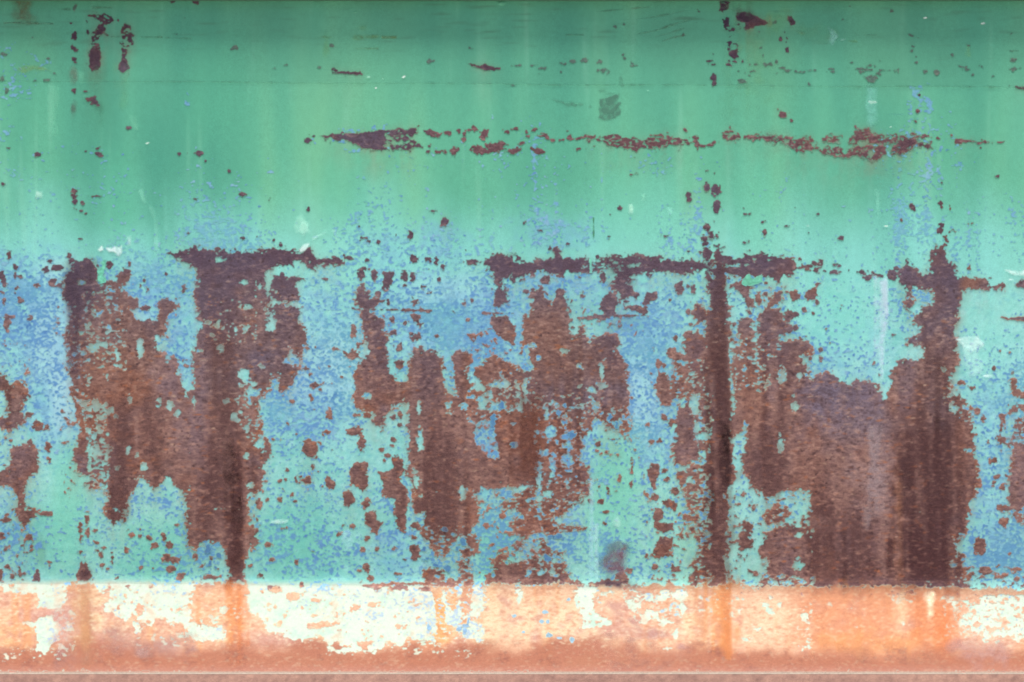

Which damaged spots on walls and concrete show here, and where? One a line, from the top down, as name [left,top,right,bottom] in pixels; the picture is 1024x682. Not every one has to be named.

rust [71,88,100,107]
rust [69,4,135,73]
rust [304,109,1005,163]
rust [706,1,835,87]
rust [849,60,899,83]
peeling [0,41,280,645]
peeling [239,72,1024,646]
rust [0,170,1024,672]